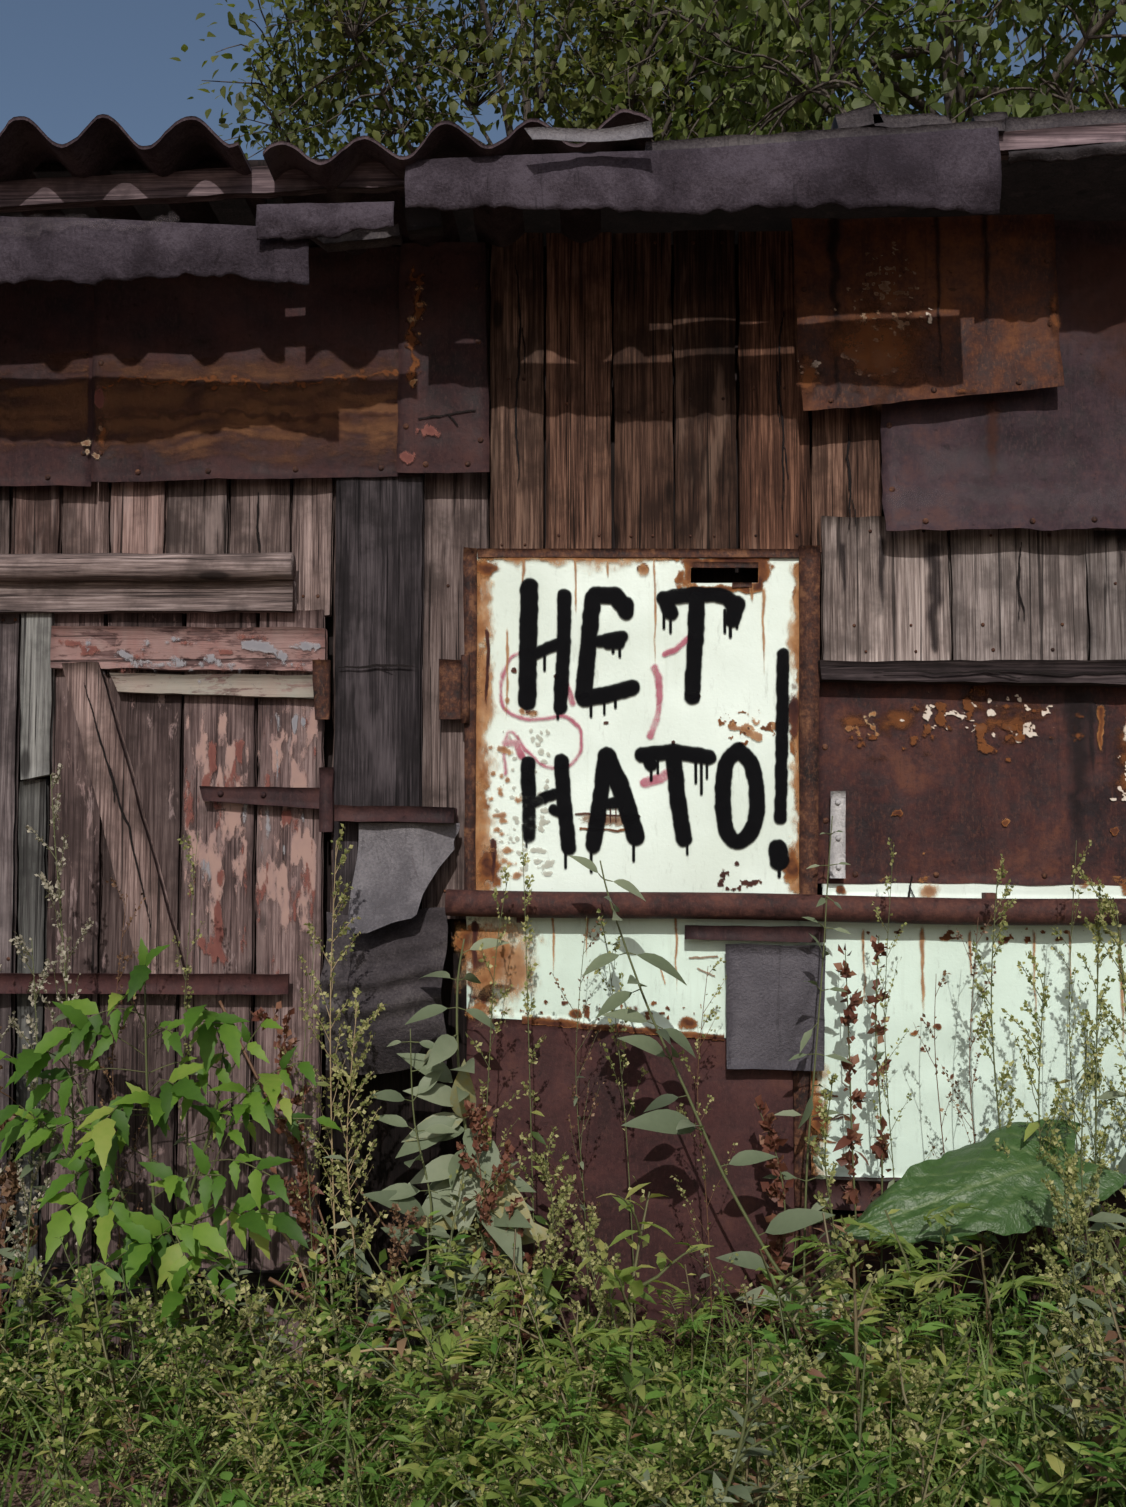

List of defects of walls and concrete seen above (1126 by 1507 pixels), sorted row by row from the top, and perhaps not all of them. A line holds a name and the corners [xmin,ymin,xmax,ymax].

corrosion [0,242,490,487]
corrosion [791,214,1126,531]
peeling [59,633,321,683]
peeling [183,707,318,974]
corrosion [475,557,774,890]
corrosion [783,562,799,894]
corrosion [818,682,1126,898]
peeling [1097,706,1126,801]
corrosion [454,921,724,1040]
corrosion [920,926,1071,1009]